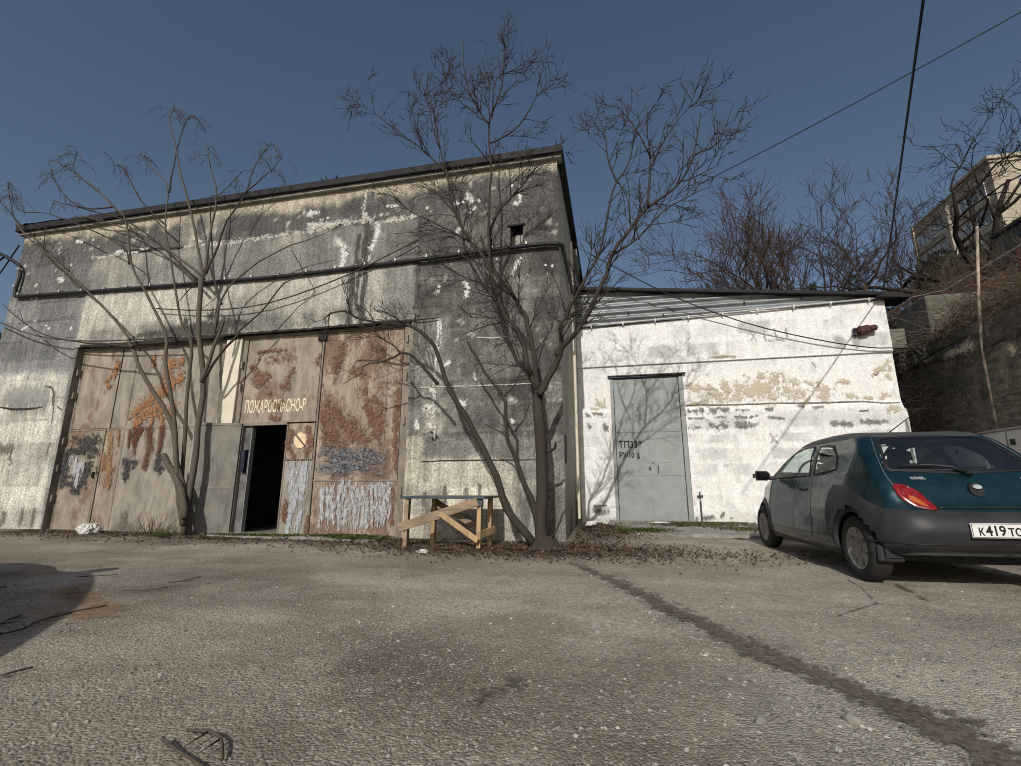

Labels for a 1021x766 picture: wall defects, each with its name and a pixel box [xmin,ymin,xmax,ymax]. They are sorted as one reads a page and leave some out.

water stain [333,220,381,326]
rust [100,353,193,493]
rust [248,348,295,422]
rust [285,343,401,473]
peeling [685,372,900,413]
peeling [872,359,893,379]
rust [279,499,288,523]